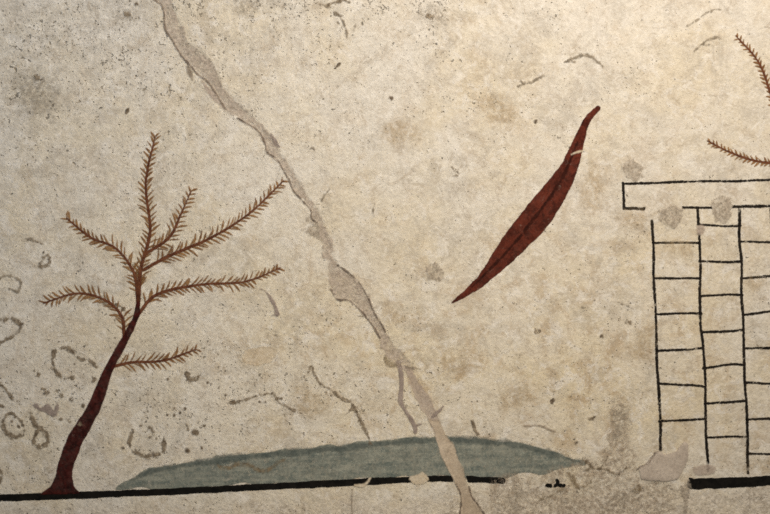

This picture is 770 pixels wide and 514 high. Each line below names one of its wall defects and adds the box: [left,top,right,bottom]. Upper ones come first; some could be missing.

crack [155,0,485,514]
peeling [409,472,429,484]
spalling [491,403,690,514]